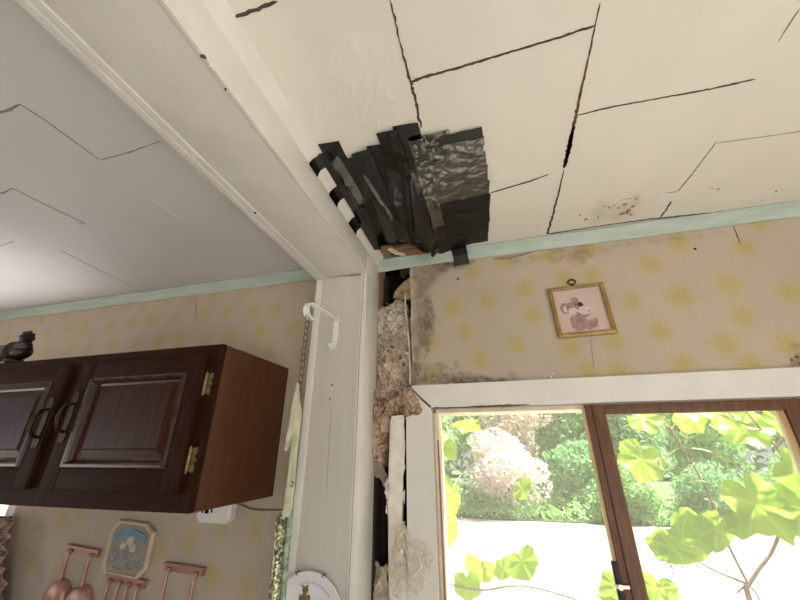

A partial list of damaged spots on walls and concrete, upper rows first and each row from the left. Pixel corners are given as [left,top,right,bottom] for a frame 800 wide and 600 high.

crack [235,1,277,18]
crack [0,104,160,160]
crack [390,0,800,243]
crack [0,188,85,224]
spalling [378,267,415,386]
spalling [371,467,388,600]